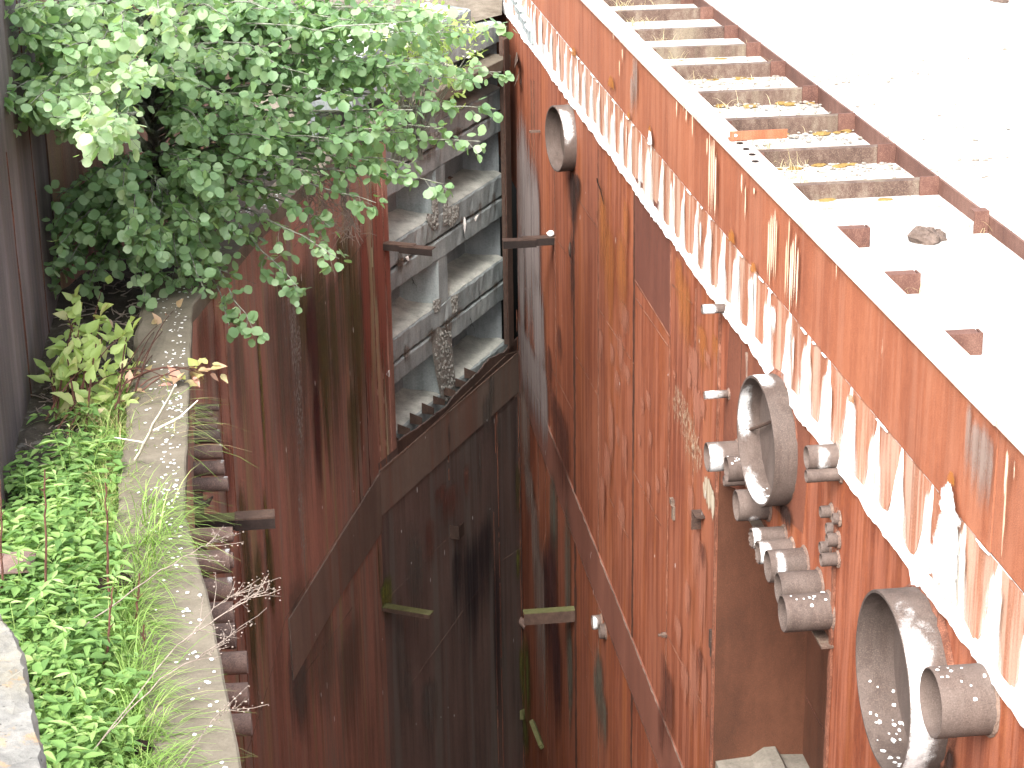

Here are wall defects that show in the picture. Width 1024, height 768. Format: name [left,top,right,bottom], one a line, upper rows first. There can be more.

corrosion [599,196,627,309]
leakage [506,0,880,512]
corrosion [306,293,322,475]
corrosion [548,327,568,477]
leakage [778,505,791,526]
leakage [890,472,905,547]
leakage [918,409,1015,625]
corrosion [543,537,556,608]
corrosion [546,623,562,721]
corrosion [658,652,672,745]
leakage [980,575,1002,673]
leakage [1015,637,1024,707]